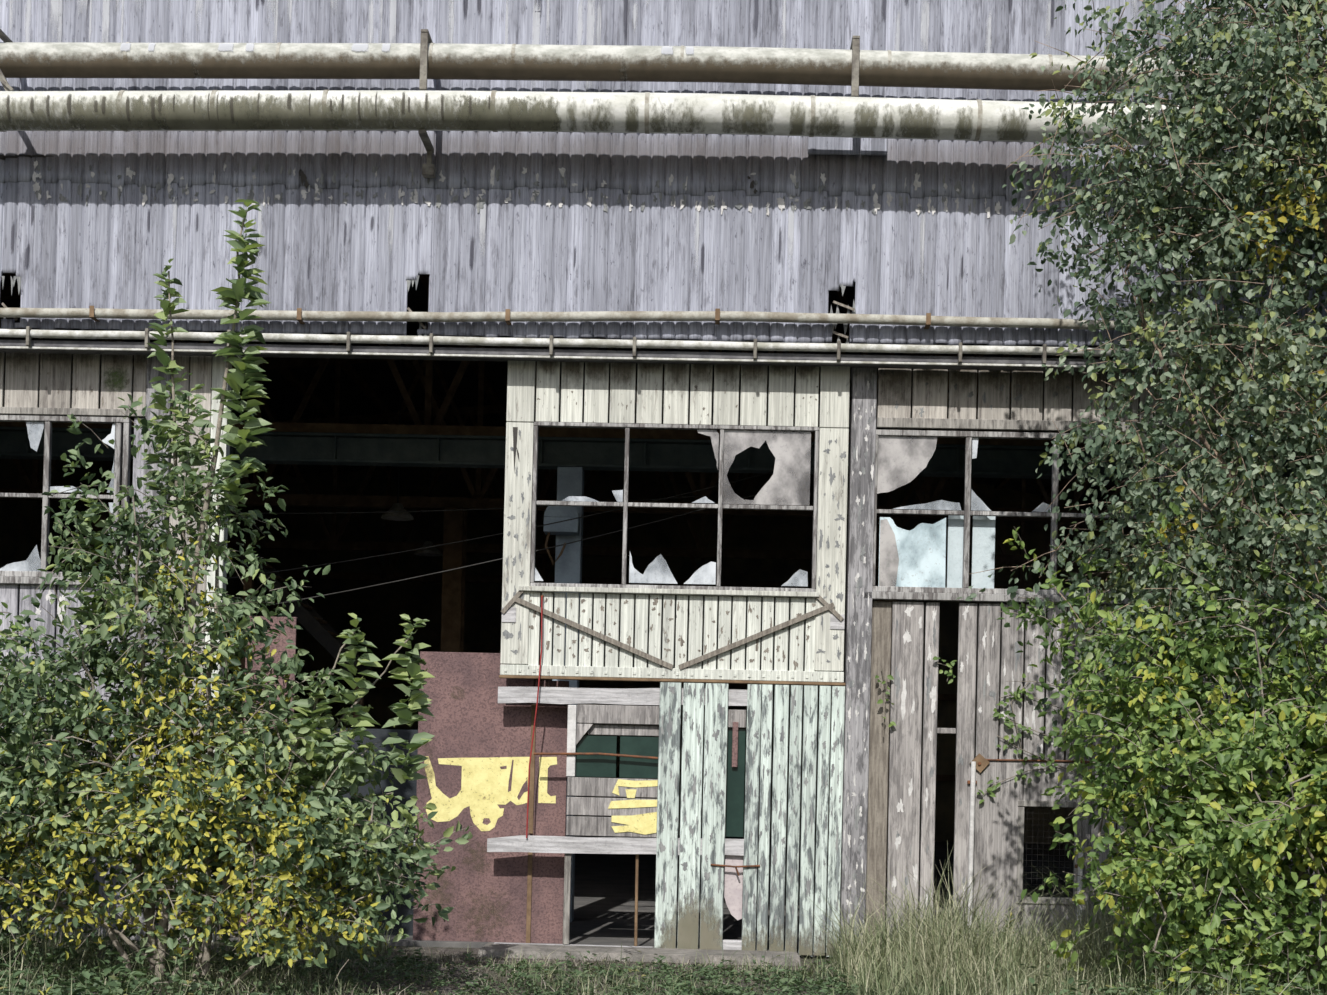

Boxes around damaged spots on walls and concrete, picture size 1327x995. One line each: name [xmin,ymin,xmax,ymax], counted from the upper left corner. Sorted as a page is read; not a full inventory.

damp [723,104,773,134]
damp [789,104,938,139]
damp [954,113,972,139]
damp [998,112,1027,141]
peeling [32,160,500,213]
peeling [504,167,1018,218]
peeling [502,467,628,658]
peeling [650,370,885,670]
peeling [894,606,936,719]
peeling [978,606,1106,759]
peeling [658,684,726,935]
peeling [744,680,869,956]